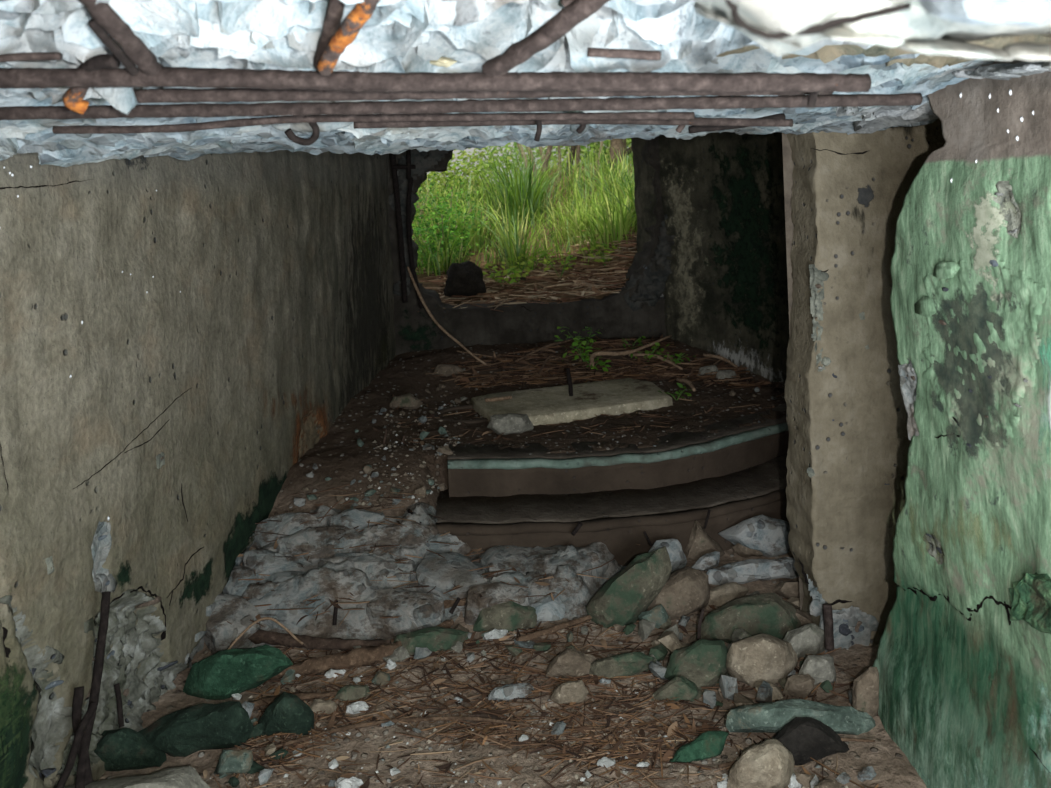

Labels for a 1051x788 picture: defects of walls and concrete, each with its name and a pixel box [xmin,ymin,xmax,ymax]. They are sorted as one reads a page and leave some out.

rust [0,0,923,134]
crack [0,179,92,189]
spalling [0,0,1051,296]
leakage [921,193,1017,457]
crack [73,388,191,489]
crack [0,621,11,667]
spalling [0,521,207,782]
crack [897,585,1012,625]